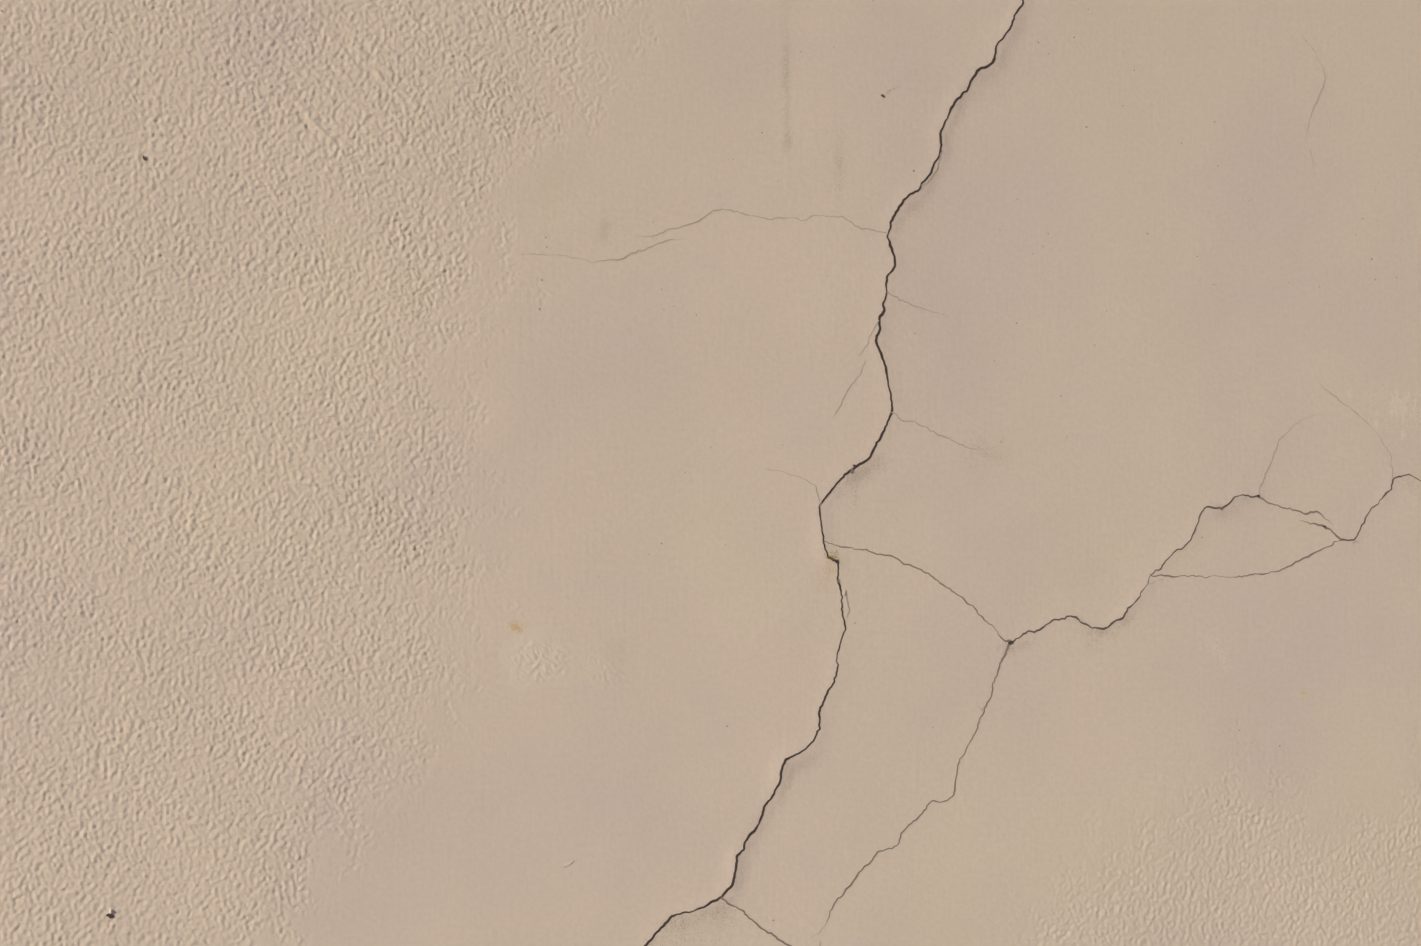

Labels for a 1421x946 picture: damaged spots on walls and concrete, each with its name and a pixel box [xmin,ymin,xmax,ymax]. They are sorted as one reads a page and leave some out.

crack [531,0,1421,946]